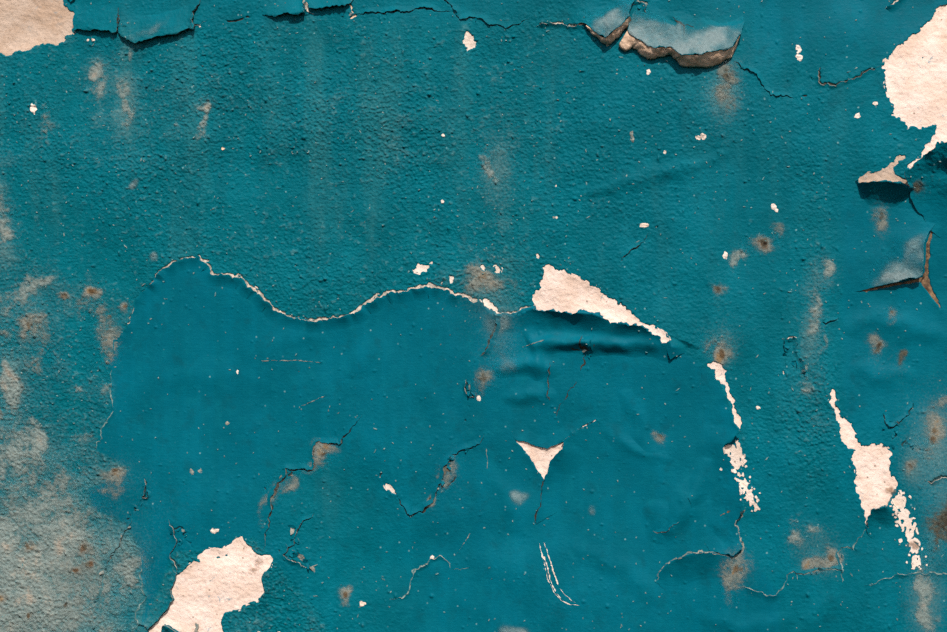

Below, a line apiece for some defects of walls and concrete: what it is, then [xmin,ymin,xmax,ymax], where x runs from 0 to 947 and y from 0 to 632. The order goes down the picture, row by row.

peeling [0,0,76,56]
crack [341,0,588,33]
peeling [858,5,947,186]
peeling [532,254,671,343]
crack [95,255,536,450]
peeling [707,362,742,428]
crack [258,417,361,572]
crack [398,379,484,516]
peeling [516,441,563,479]
peeling [828,389,898,527]
peeling [149,536,273,632]
crack [654,510,745,580]